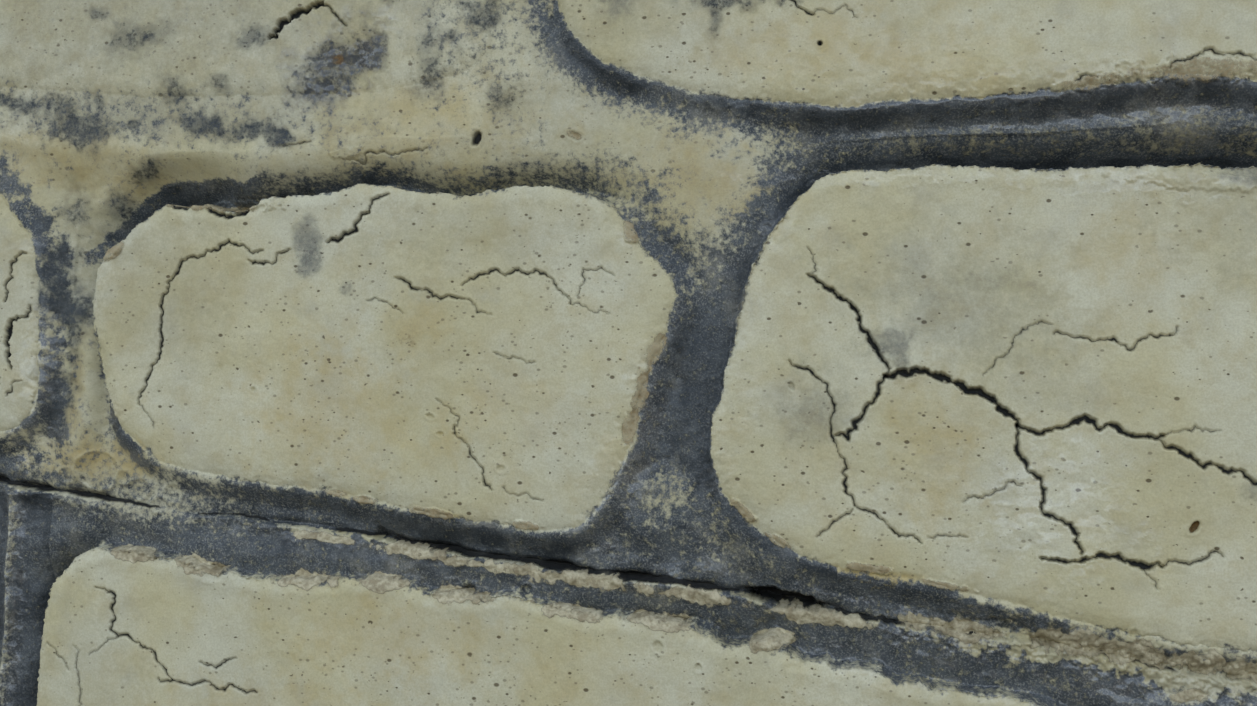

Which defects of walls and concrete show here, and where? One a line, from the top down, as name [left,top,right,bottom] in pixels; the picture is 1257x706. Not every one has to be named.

damp [293,30,387,100]
damp [0,94,109,148]
damp [180,112,293,146]
damp [40,241,93,342]
crack [139,202,289,398]
crack [791,264,1257,587]
crack [0,476,159,508]
spalling [294,530,354,545]
crack [336,528,740,591]
spalling [369,540,872,654]
spalling [897,611,1012,644]
spalling [1030,628,1257,683]